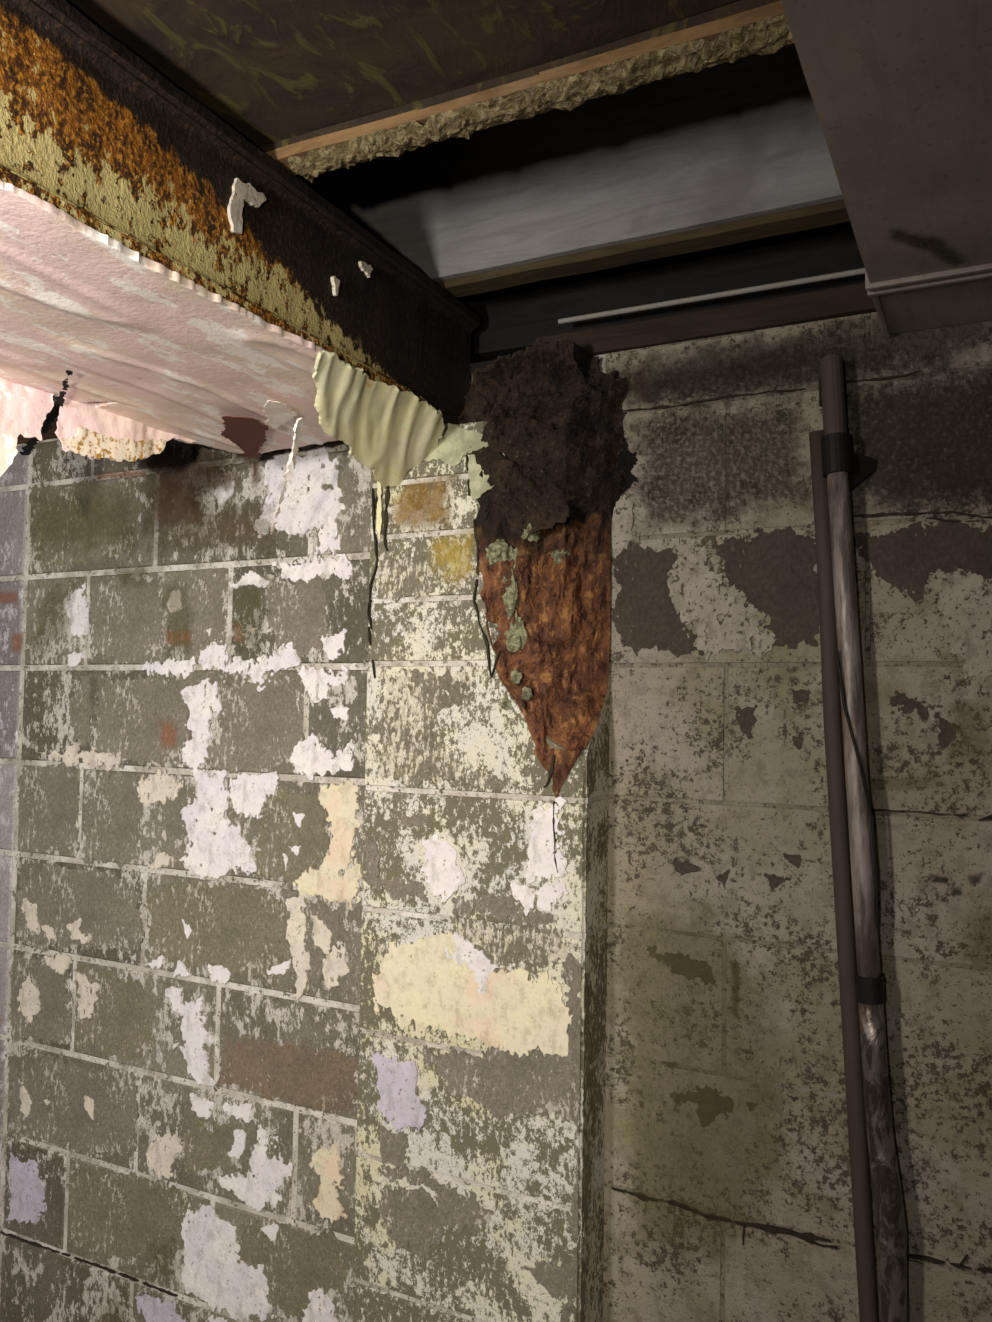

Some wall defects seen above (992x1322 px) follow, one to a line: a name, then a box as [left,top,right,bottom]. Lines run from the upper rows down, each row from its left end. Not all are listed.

leakage [620,320,992,523]
peeling [853,517,992,682]
peeling [0,180,820,1322]
crack [611,1187,838,1249]
crack [907,1254,992,1273]